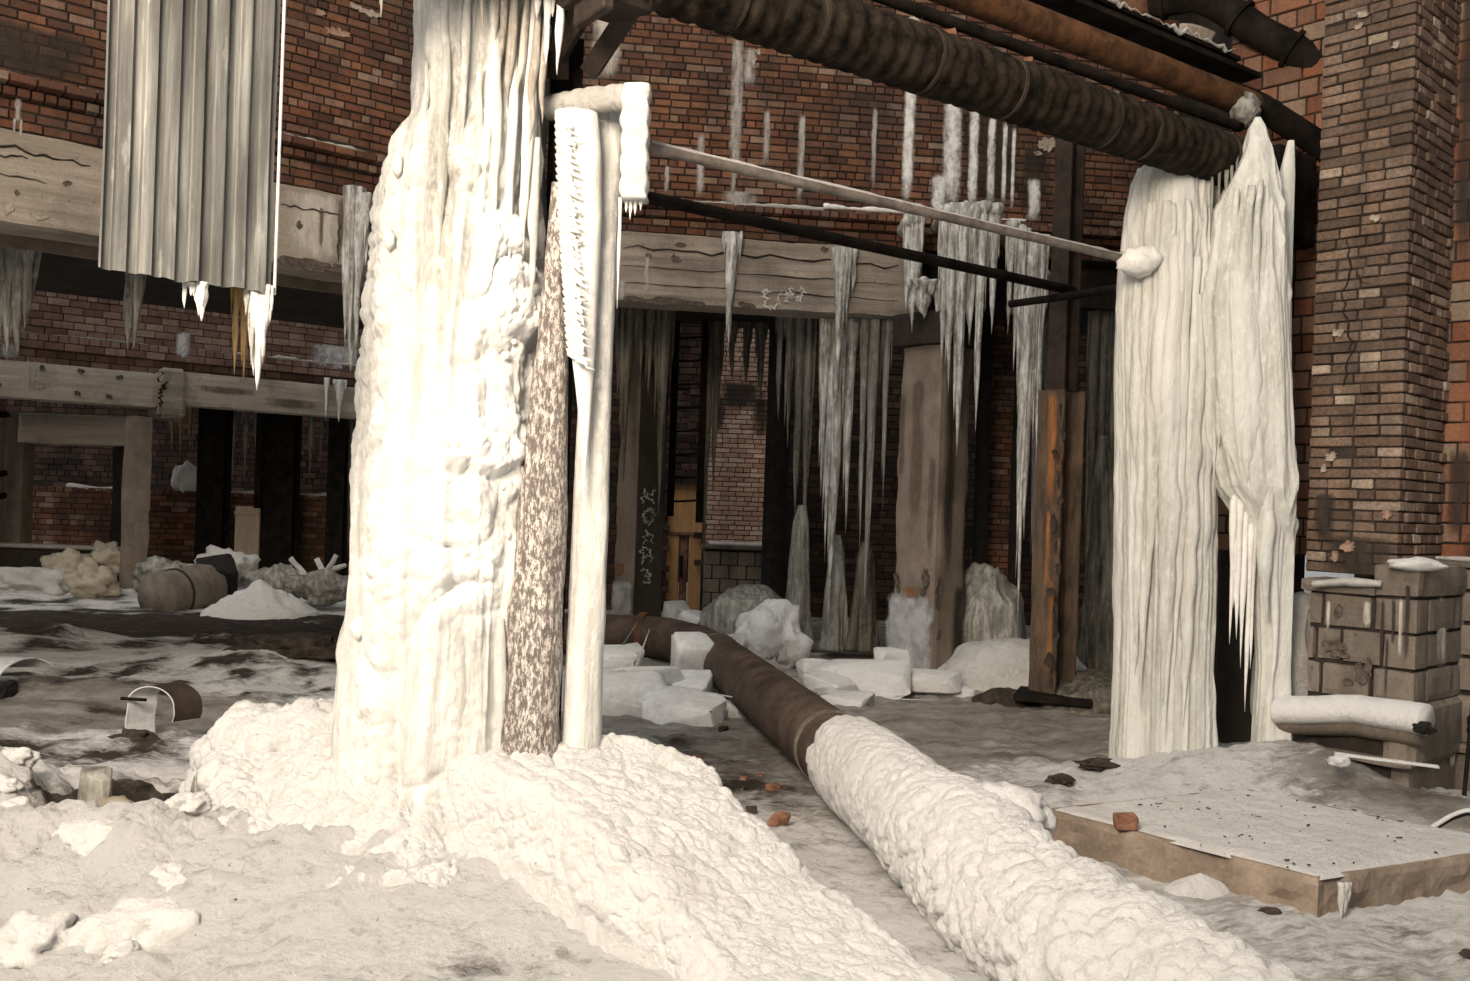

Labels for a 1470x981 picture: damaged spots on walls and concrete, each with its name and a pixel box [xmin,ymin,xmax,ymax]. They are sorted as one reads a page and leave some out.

crack [0,144,90,184]